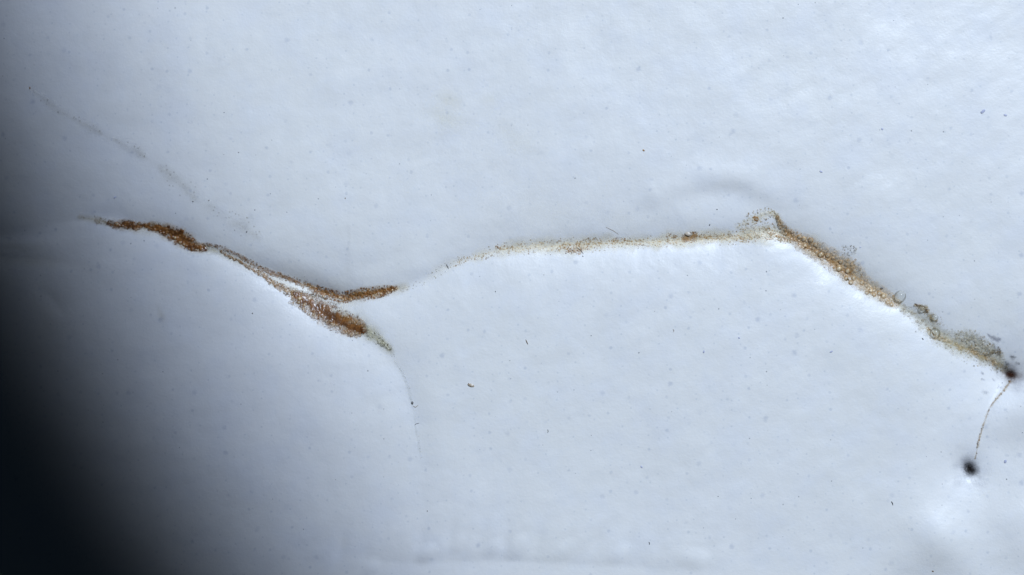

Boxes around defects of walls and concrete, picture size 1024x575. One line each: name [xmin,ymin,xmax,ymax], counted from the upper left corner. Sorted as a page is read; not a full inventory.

rust [99,218,397,351]
rust [495,208,788,254]